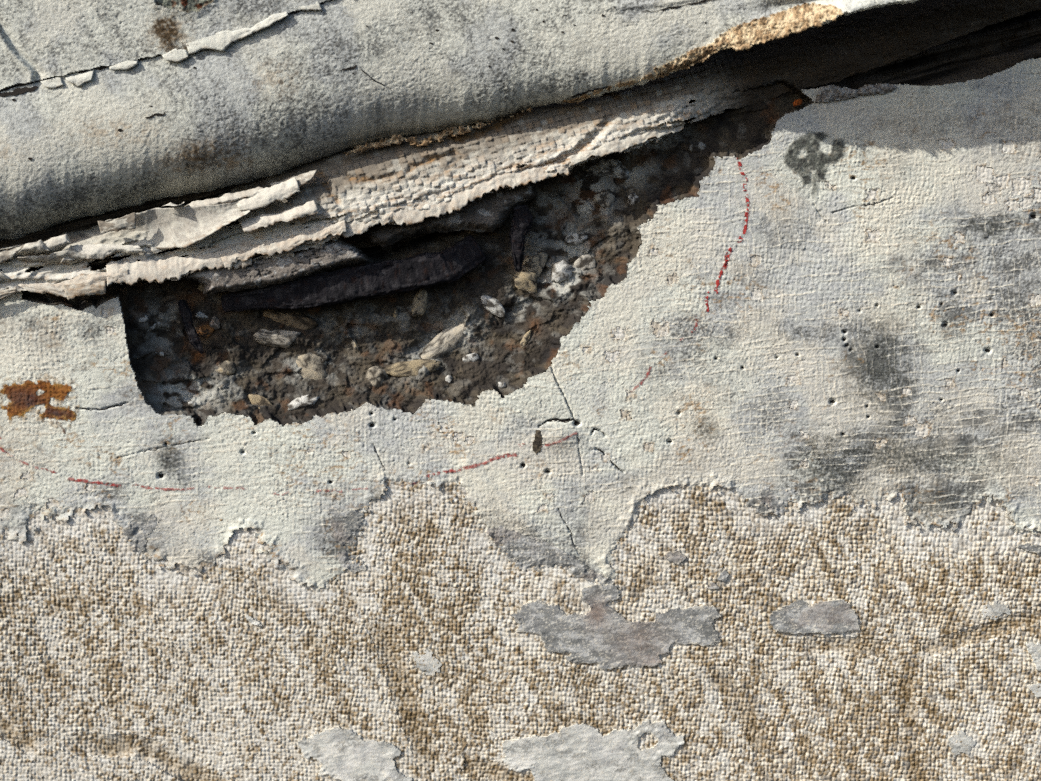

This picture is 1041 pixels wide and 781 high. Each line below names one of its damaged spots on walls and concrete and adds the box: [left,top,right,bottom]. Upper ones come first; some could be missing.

crack [145,111,168,119]
crack [0,0,331,97]
crack [340,65,388,87]
spalling [22,78,897,433]
rust [0,380,76,434]
crack [539,367,623,475]
peeling [0,471,1041,781]